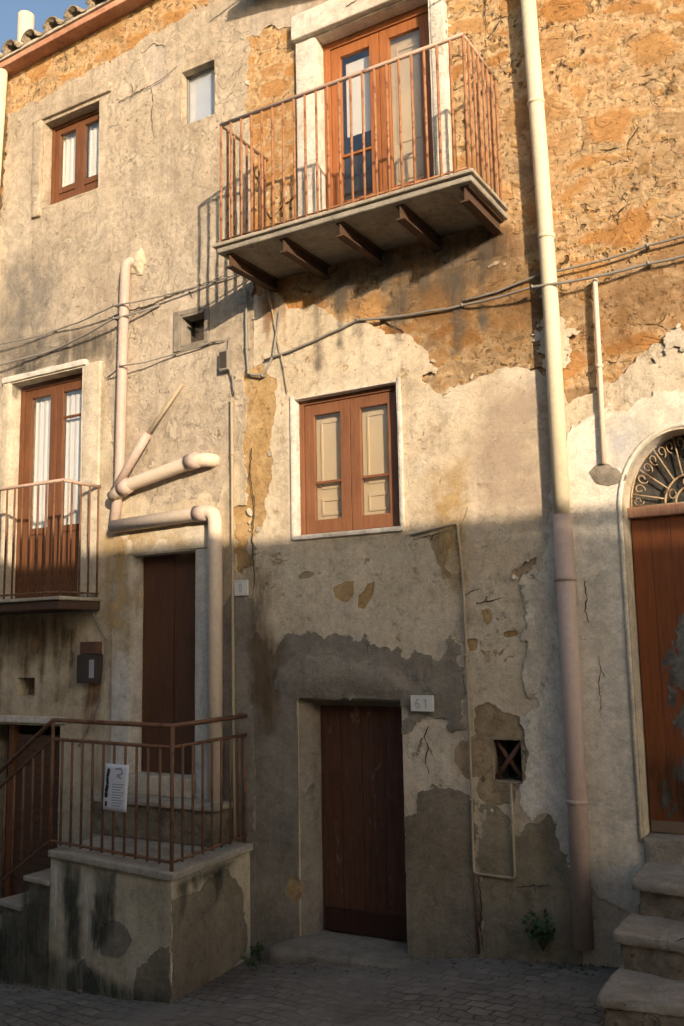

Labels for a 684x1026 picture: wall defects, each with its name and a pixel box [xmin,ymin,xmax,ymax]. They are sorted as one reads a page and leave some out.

spalling [244,25,298,217]
spalling [378,254,547,396]
flaking render [560,317,581,369]
flaking render [653,323,684,363]
spalling [333,581,375,609]
spalling [429,533,453,579]
spalling [512,557,537,579]
peeling [660,613,684,738]
spalling [454,702,529,812]
leakage [0,863,163,1003]
spalling [132,869,248,1003]